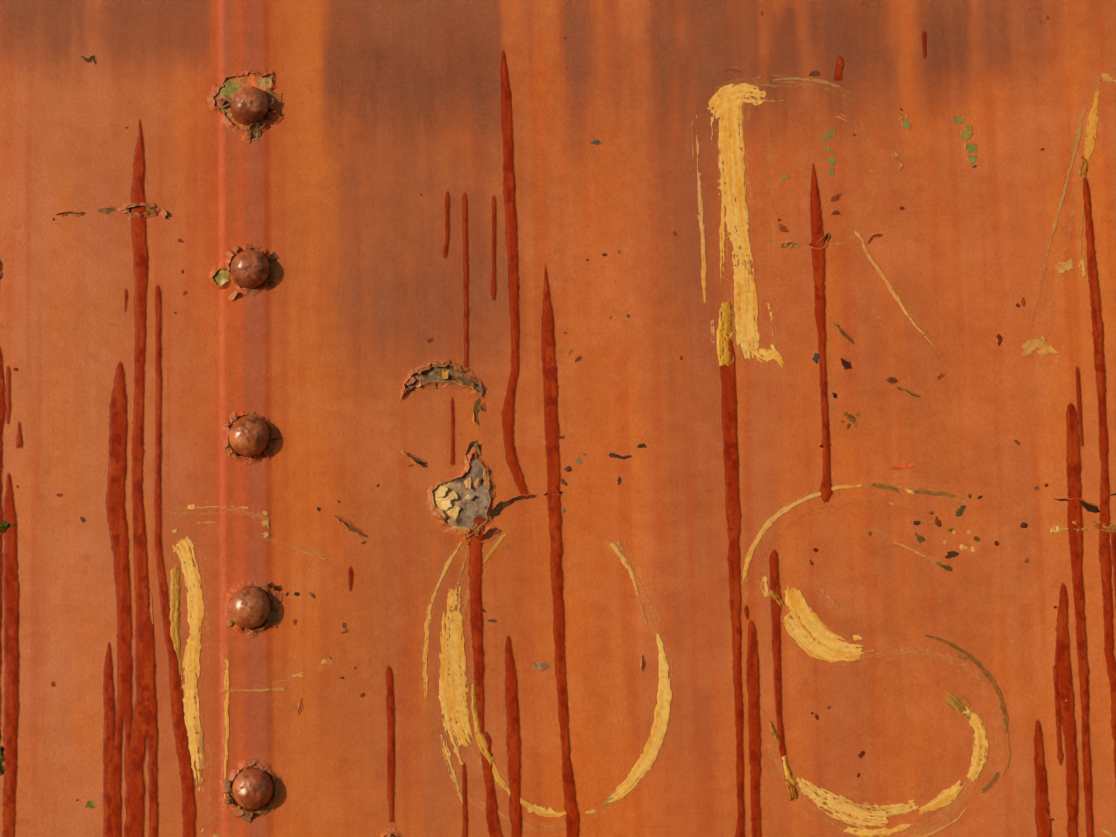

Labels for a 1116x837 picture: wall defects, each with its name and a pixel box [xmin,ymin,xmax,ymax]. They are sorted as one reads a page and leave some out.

corrosion [0,349,23,837]
corrosion [103,120,196,837]
peeling [398,359,487,425]
peeling [427,440,496,543]
corrosion [468,518,522,837]
corrosion [491,51,530,497]
corrosion [542,268,580,837]
corrosion [720,335,762,837]
corrosion [769,551,786,779]
corrosion [810,165,833,502]
corrosion [1034,367,1094,837]
corrosion [1083,178,1116,778]